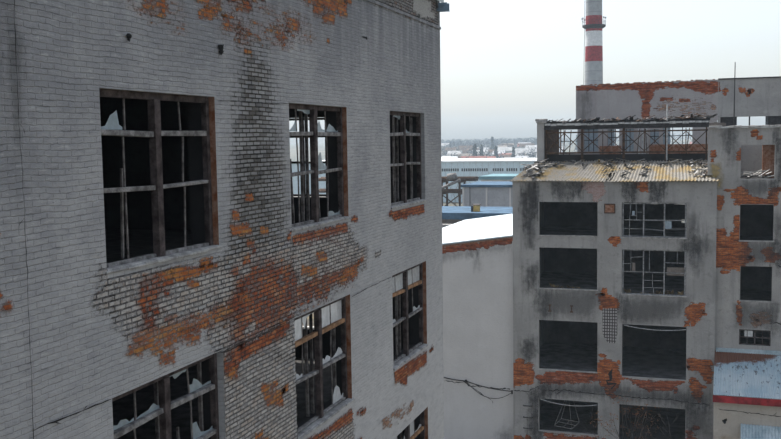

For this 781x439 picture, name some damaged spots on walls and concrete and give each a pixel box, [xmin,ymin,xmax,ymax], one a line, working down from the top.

peeling [374,0,439,27]
spalling [576,81,755,119]
damp [224,47,289,287]
spalling [442,239,513,254]
spalling [716,185,781,274]
peeling [91,211,381,439]
spalling [683,302,707,327]
spalling [513,353,714,403]